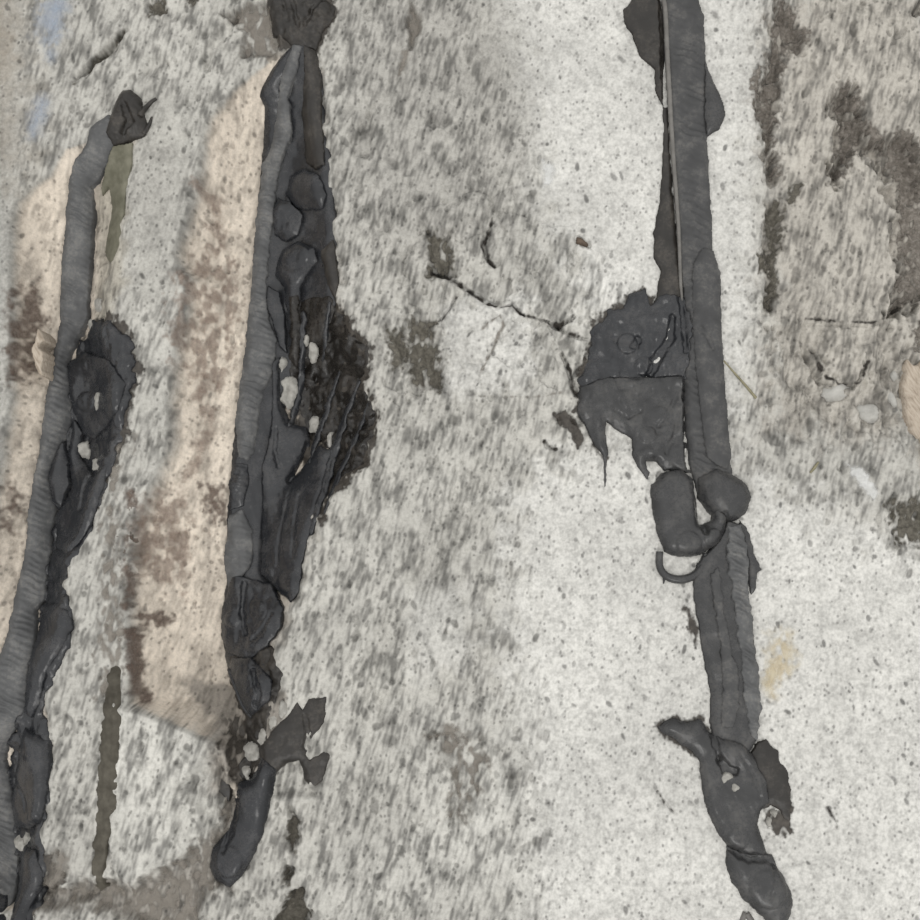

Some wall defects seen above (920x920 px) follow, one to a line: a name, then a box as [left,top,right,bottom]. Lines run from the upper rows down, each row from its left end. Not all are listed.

spalling [749,0,812,312]
spalling [830,80,920,311]
crack [481,222,496,269]
crack [431,271,580,370]
spalling [911,321,920,353]
crack [566,363,578,396]
spalling [883,496,920,548]
spalling [275,867,313,920]